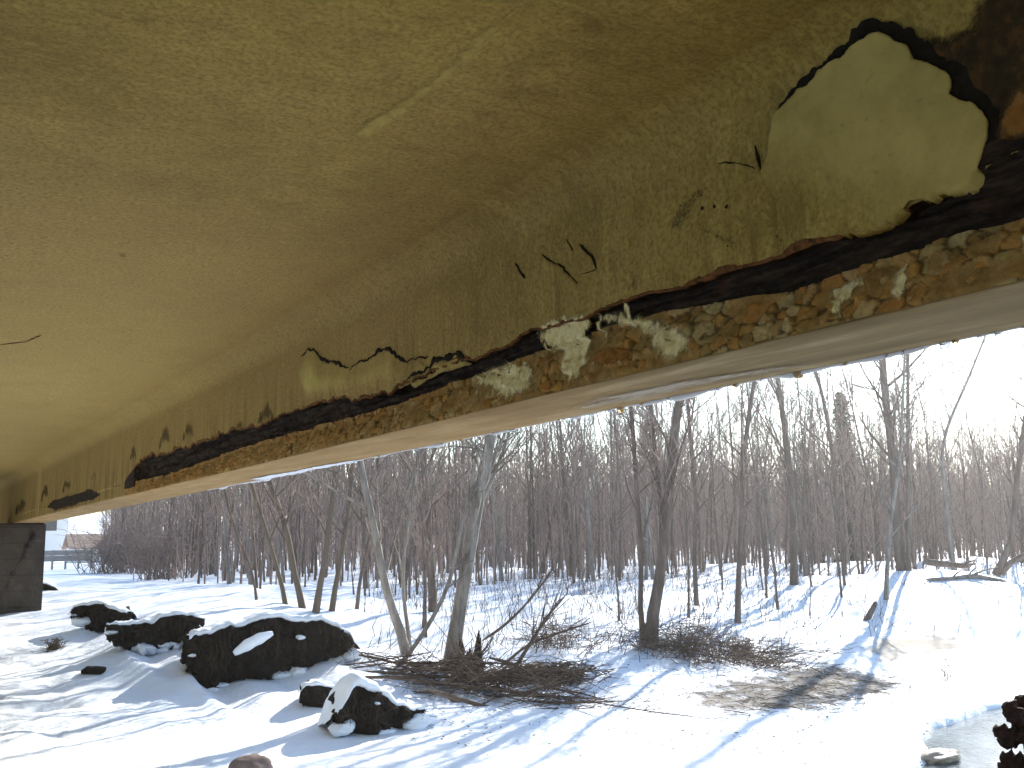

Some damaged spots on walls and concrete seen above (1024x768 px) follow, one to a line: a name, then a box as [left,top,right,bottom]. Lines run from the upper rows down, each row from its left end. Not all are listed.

crack [718,145,763,182]
crack [515,239,597,294]
spalling [122,18,1024,497]
leakage [541,304,689,380]
leakage [472,362,532,399]
spalling [48,489,100,510]